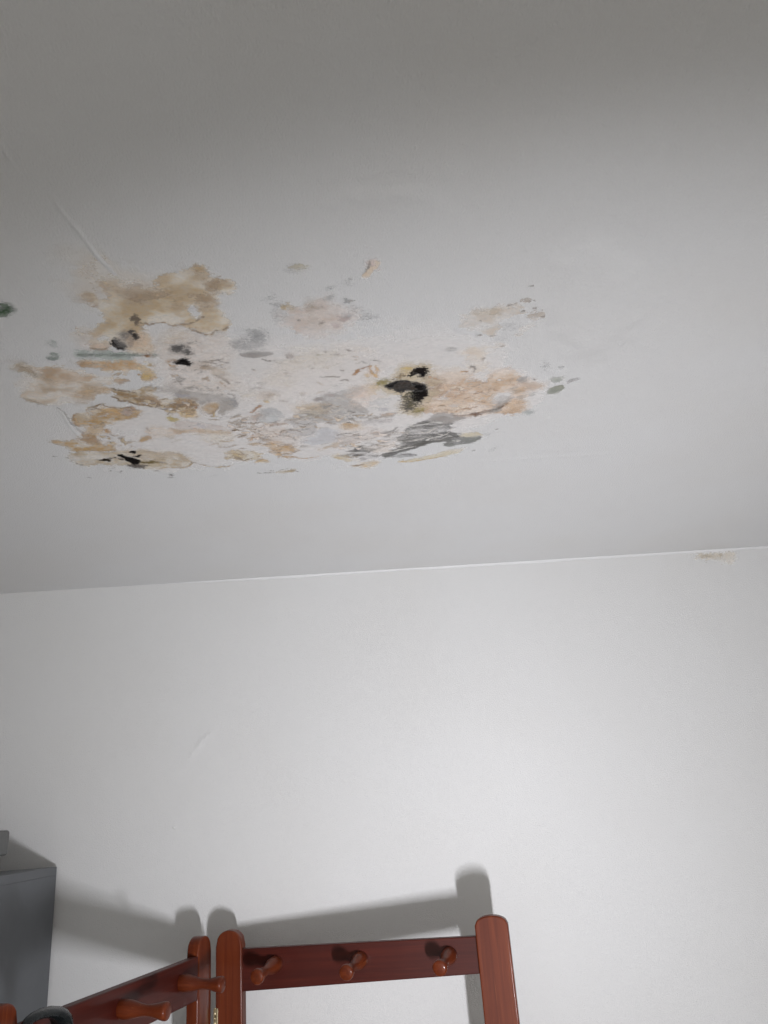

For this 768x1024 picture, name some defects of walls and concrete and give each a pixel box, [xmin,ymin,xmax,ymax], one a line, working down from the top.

leakage [17,264,578,478]